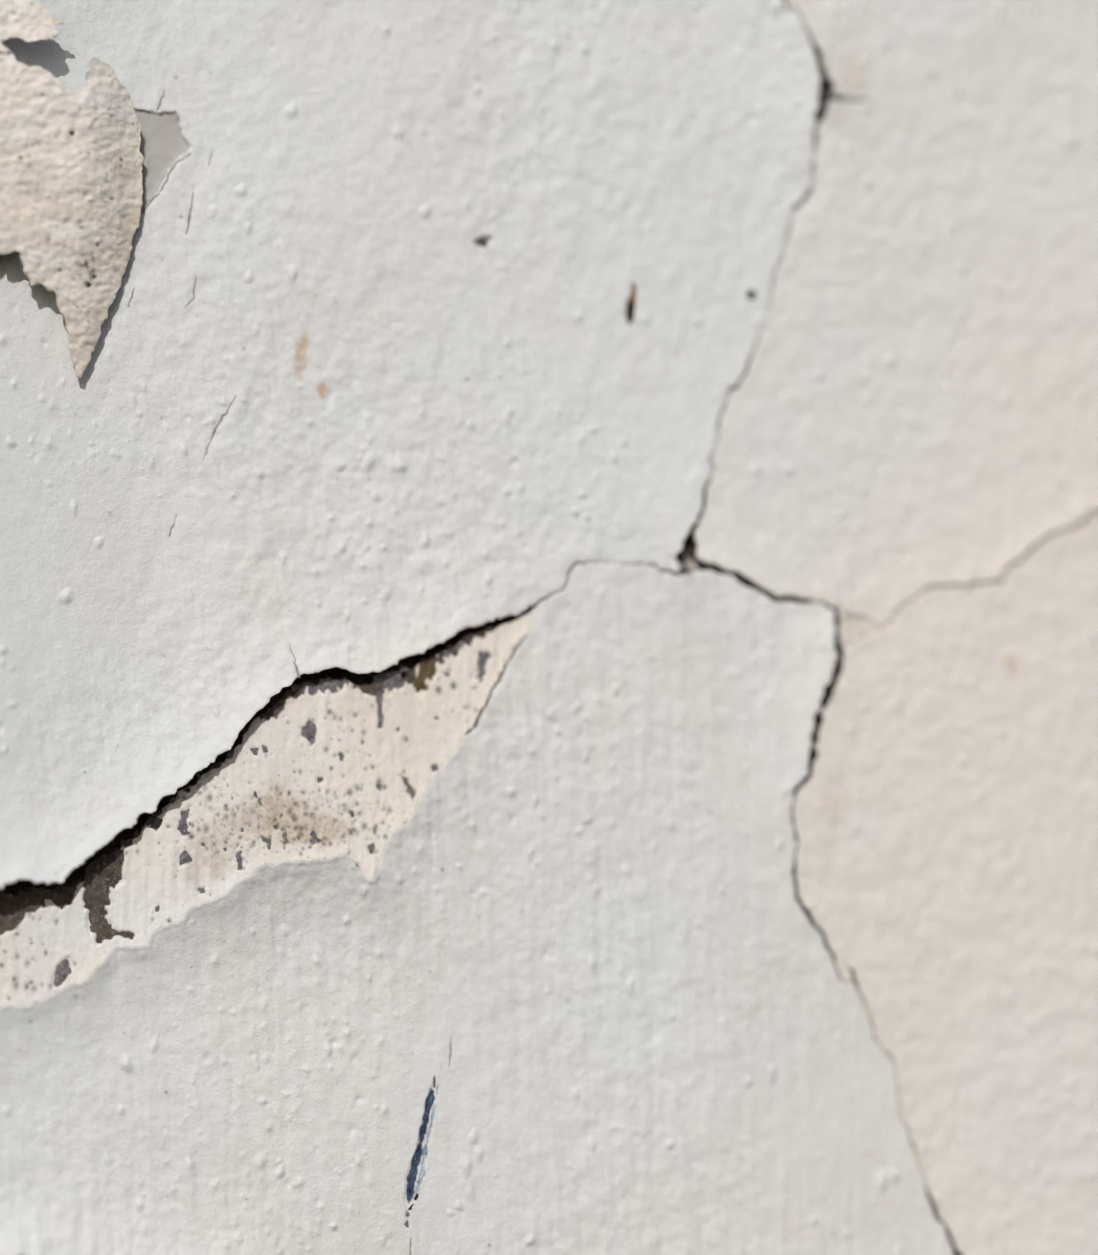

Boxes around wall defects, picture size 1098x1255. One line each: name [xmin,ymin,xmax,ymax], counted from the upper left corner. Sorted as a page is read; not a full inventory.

crack [784,0,871,170]
peeling [0,0,189,378]
corrosion [626,283,636,325]
crack [0,336,1098,1066]
peeling [0,611,532,1006]
peeling [404,1076,439,1228]
crack [905,1125,962,1255]